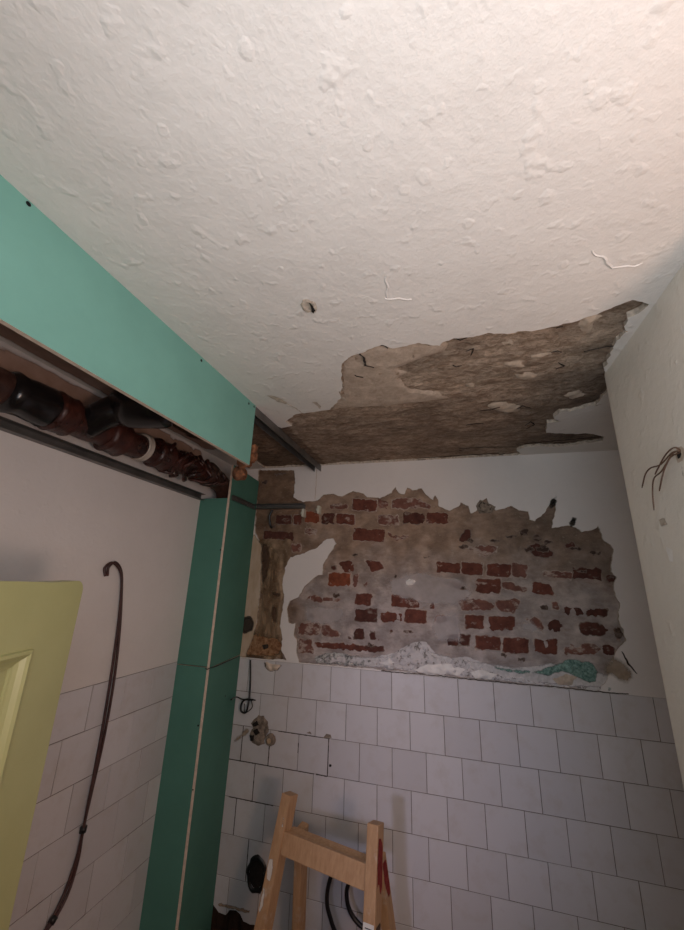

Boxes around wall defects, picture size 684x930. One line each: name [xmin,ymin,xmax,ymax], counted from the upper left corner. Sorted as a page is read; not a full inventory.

flaking render [300,299,317,314]
peeling [503,348,558,380]
peeling [488,402,521,414]
peeling [564,390,586,399]
flaking render [243,470,625,676]
water stain [315,641,631,691]
spalling [249,715,269,746]